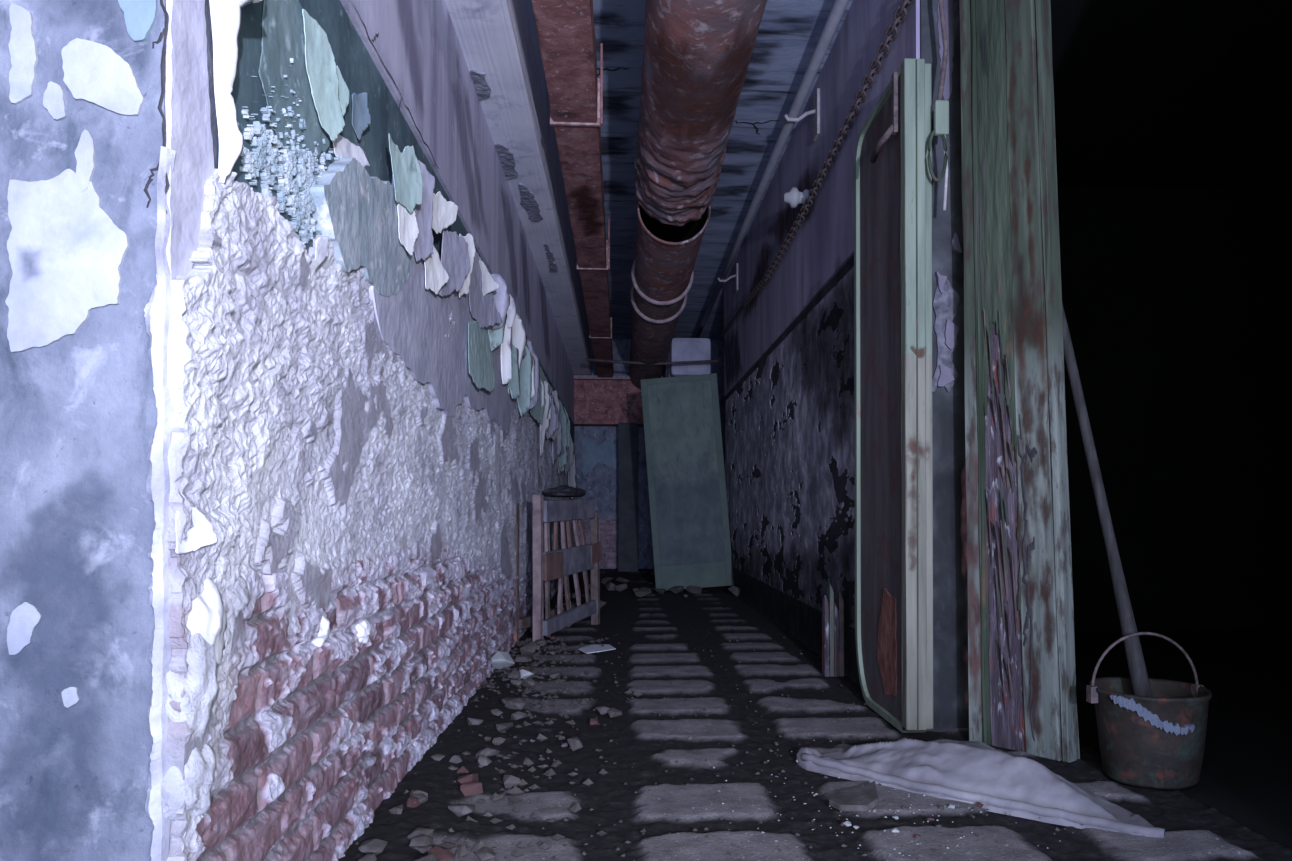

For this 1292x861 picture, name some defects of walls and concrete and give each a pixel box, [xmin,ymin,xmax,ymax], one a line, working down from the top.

peeling [9,4,145,121]
peeling [5,130,130,353]
spalling [118,0,618,861]
peeling [7,602,42,655]
peeling [61,686,81,708]